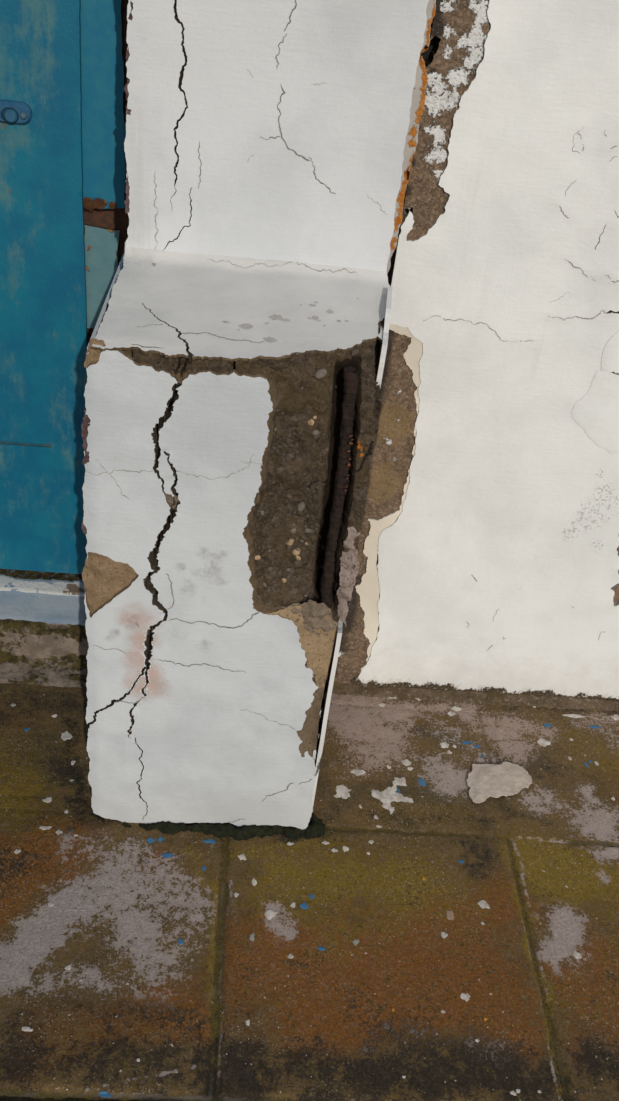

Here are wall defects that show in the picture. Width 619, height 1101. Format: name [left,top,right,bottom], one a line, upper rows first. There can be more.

crack [153,0,202,249]
crack [247,0,336,194]
corrosion [390,3,437,250]
peeling [398,0,490,240]
peeling [222,314,290,331]
crack [423,315,531,342]
crack [549,210,619,320]
peeling [82,552,138,615]
crack [86,306,264,820]
spalling [132,321,423,757]
peeling [611,570,619,605]